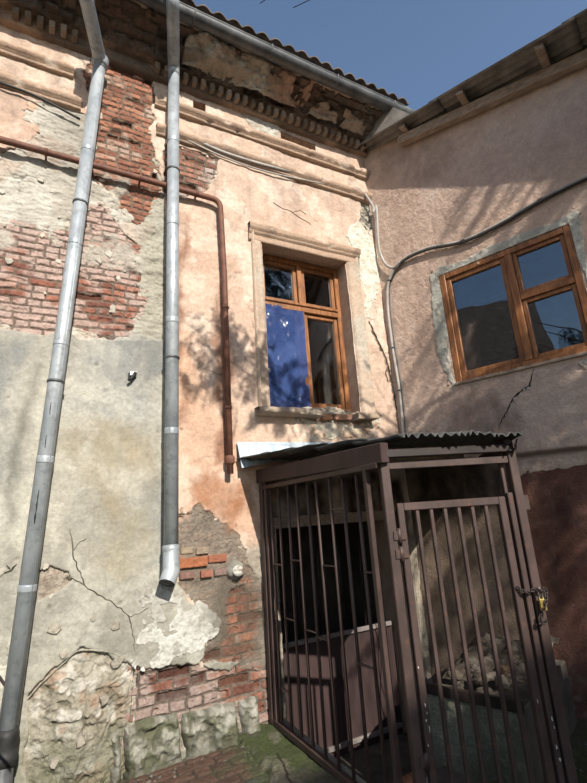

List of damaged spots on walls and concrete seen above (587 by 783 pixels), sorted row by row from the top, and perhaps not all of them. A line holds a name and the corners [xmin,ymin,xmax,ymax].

flaking render [0,99,86,336]
flaking render [82,59,93,95]
flaking render [70,65,167,341]
flaking render [179,147,218,201]
flaking render [241,112,279,138]
flaking render [346,200,380,318]
crack [368,321,400,432]
crack [498,369,535,428]
crack [67,533,149,650]
spalling [121,503,270,749]